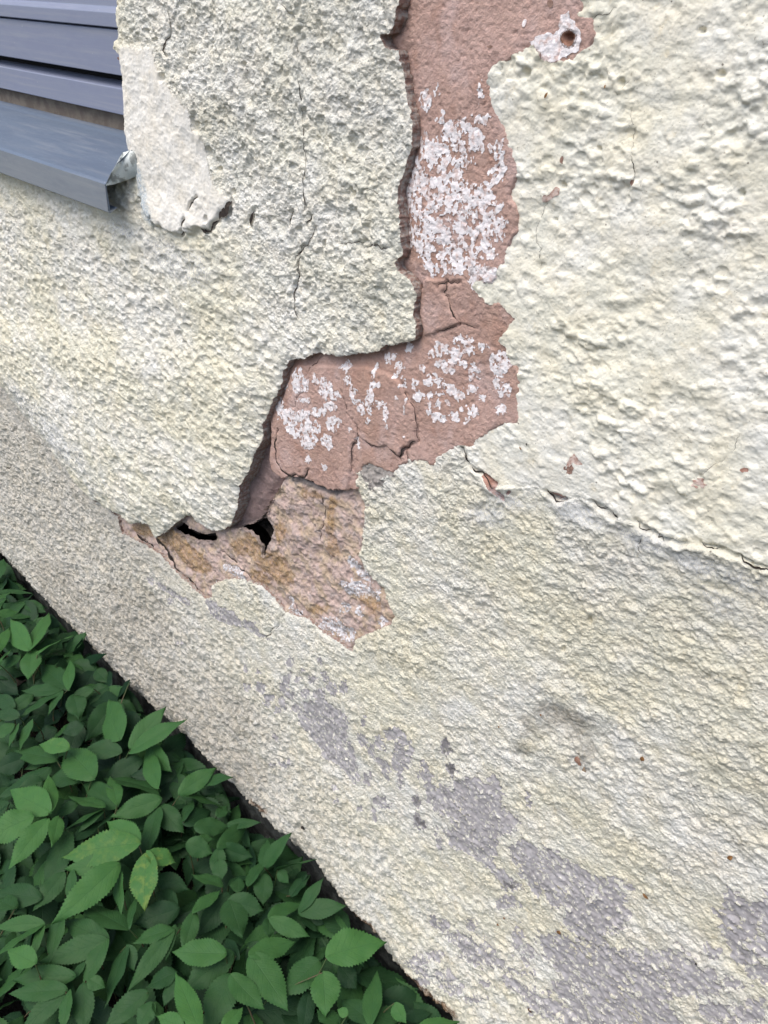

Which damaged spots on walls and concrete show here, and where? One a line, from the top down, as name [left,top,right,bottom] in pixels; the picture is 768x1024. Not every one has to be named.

crack [290,49,316,322]
crack [181,197,254,235]
flaking render [118,0,596,648]
crack [343,387,419,470]
crack [463,448,494,489]
crack [594,501,664,555]
crack [703,544,768,570]